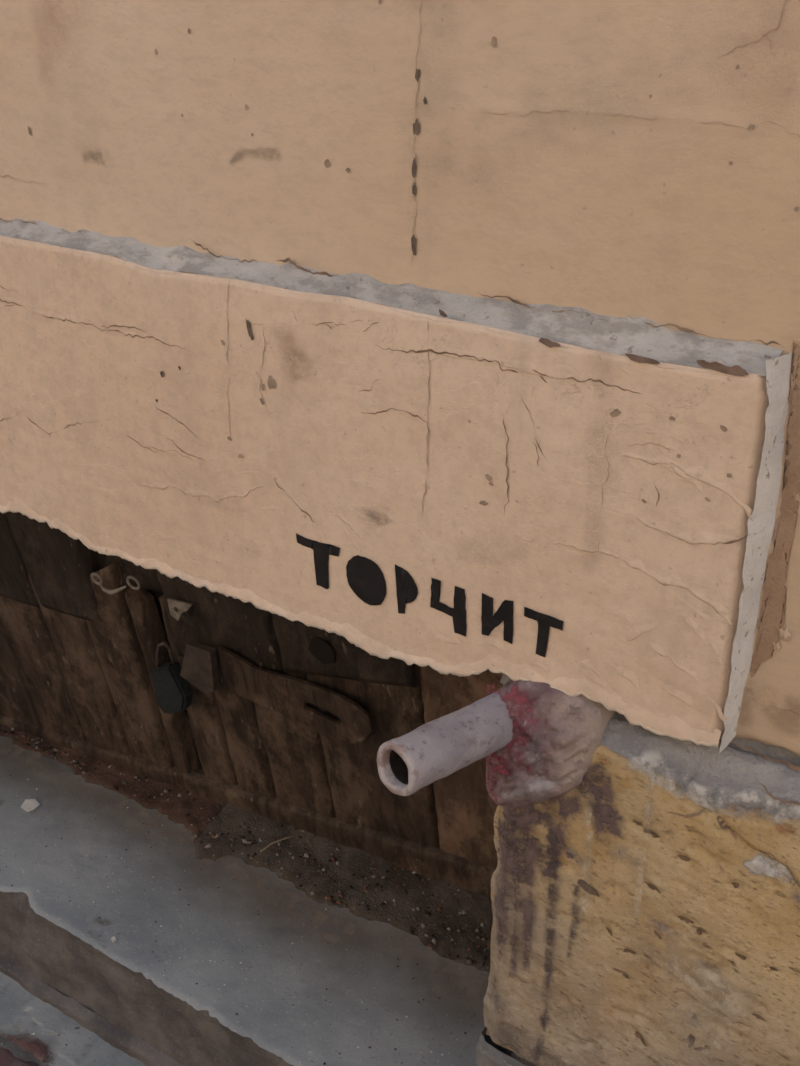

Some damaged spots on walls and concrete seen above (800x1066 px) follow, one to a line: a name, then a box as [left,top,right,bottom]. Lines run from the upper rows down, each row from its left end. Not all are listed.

crack [411,0,423,267]
crack [0,283,190,352]
peeling [539,337,561,348]
peeling [625,353,660,364]
peeling [697,360,749,377]
crack [107,407,202,460]
crack [300,311,641,513]
crack [601,427,675,507]
spalling [750,338,800,678]
water stain [629,750,800,833]
water stain [486,683,622,1066]
water stain [669,955,742,1029]